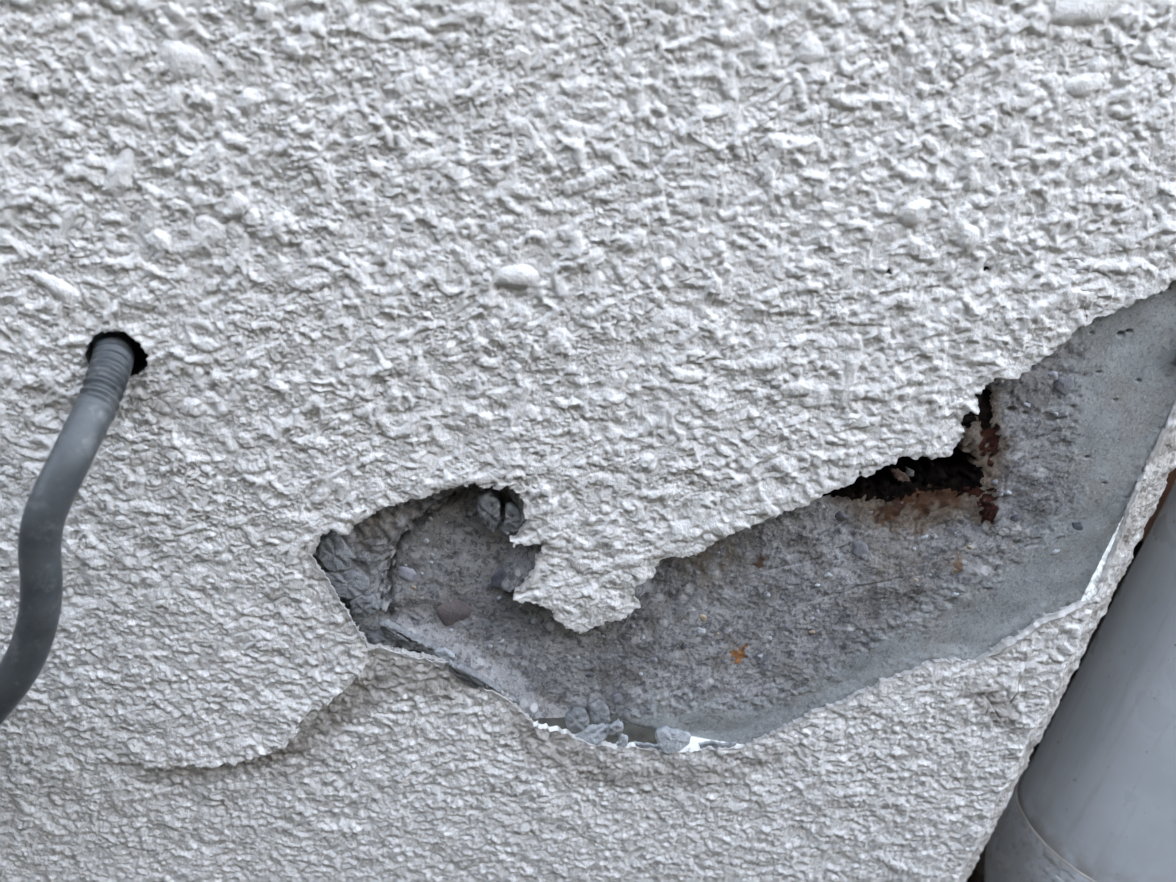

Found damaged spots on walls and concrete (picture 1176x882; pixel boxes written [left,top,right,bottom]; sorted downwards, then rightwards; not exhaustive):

spalling [309,280,1176,756]
corrosion [815,386,1001,524]